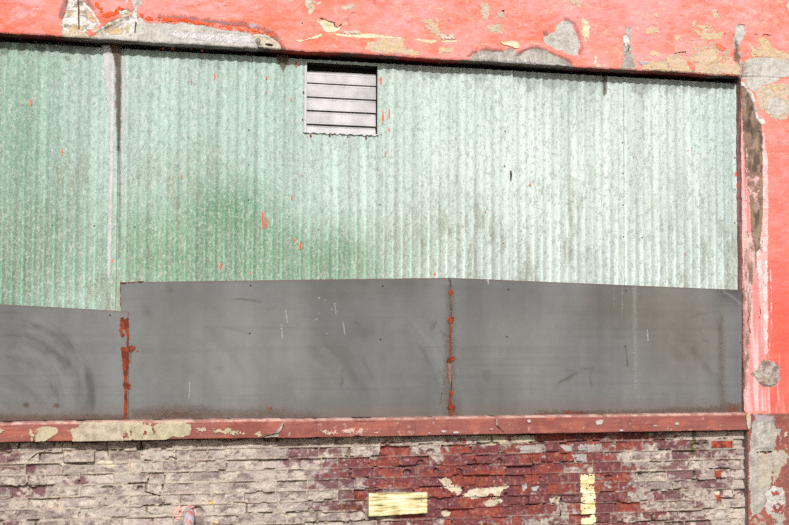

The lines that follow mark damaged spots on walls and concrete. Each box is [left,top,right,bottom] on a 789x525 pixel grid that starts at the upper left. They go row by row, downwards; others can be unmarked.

peeling [59,0,285,50]
peeling [296,0,457,56]
peeling [467,2,590,67]
spalling [621,9,789,516]
rust [119,312,138,420]
rust [440,279,455,416]
peeling [29,426,58,442]
peeling [70,421,245,441]
peeling [479,428,547,454]
peeling [560,443,602,463]
peeling [438,477,510,507]
peeling [772,507,784,525]